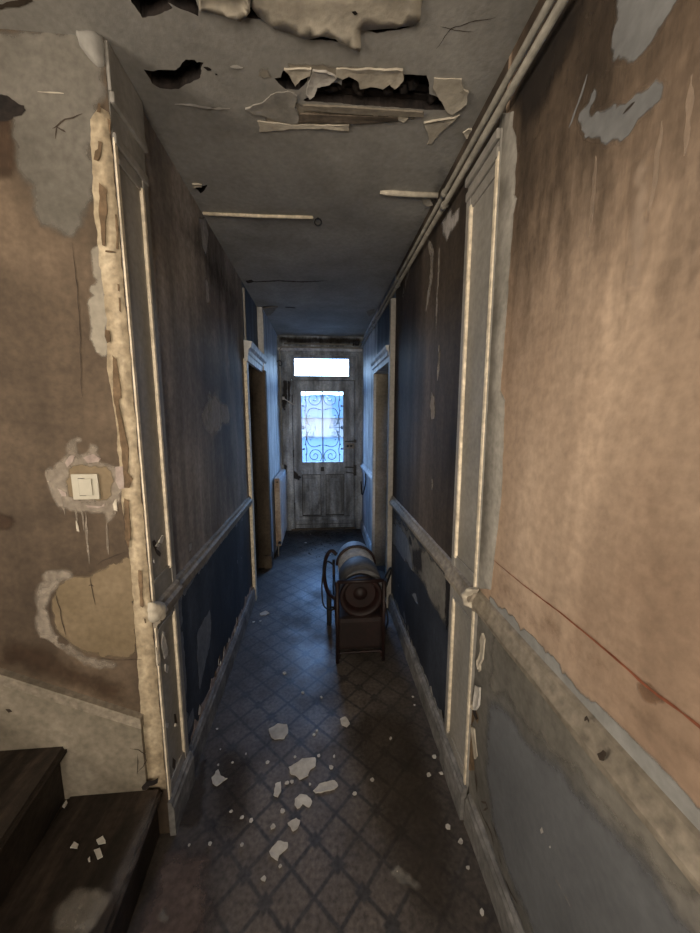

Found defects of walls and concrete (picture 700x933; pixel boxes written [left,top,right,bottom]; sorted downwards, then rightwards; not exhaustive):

peeling [131,0,422,52]
crack [436,17,496,49]
spalling [0,94,26,176]
spalling [144,60,217,89]
spalling [245,64,469,144]
spalling [98,183,118,253]
spalling [112,356,133,548]
spalling [152,535,164,563]
spalling [476,633,486,672]
spalling [465,685,481,786]
leakage [489,636,699,897]